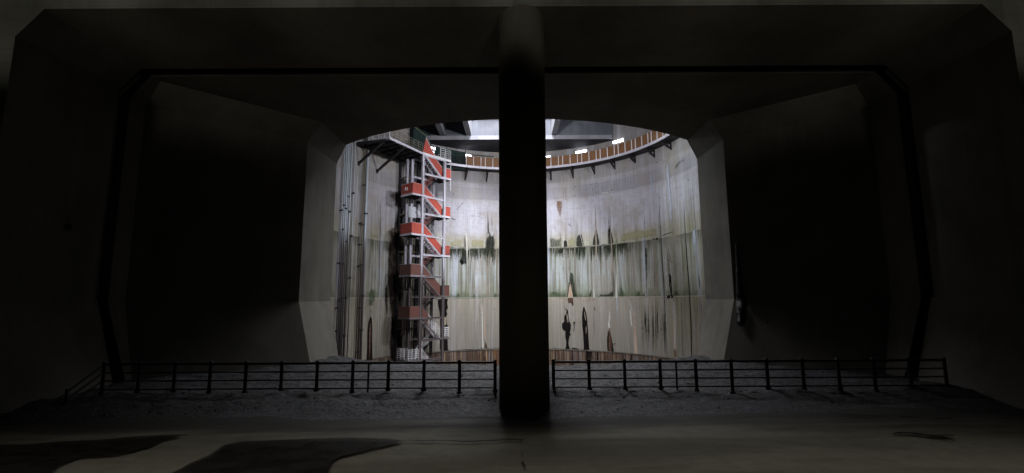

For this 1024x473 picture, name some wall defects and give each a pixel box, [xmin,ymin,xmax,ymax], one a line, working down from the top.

water stain [385,191,403,359]
water stain [450,223,496,265]
water stain [549,211,627,310]